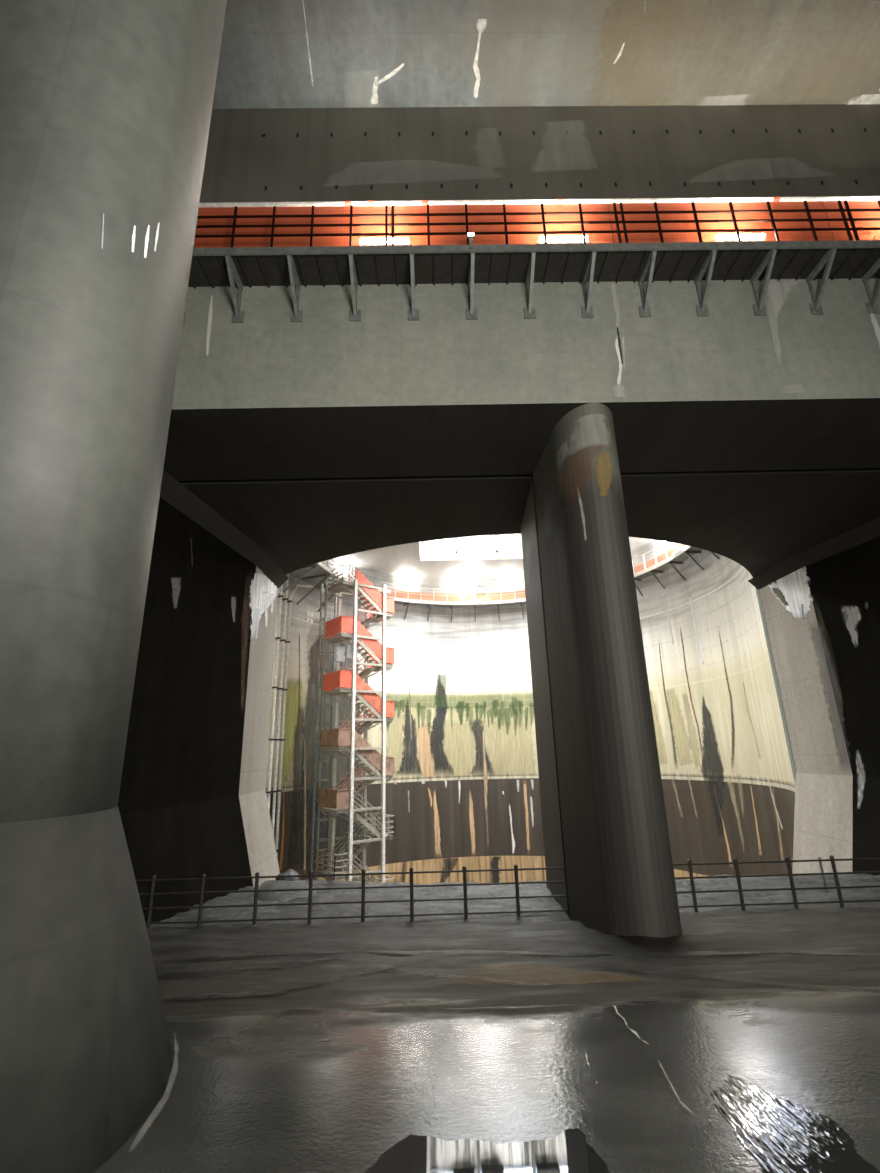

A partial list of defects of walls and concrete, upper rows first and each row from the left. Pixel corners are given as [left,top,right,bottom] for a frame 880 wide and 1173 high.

crack [302,0,313,82]
damp [371,64,404,104]
damp [473,20,486,97]
peeling [768,566,812,618]